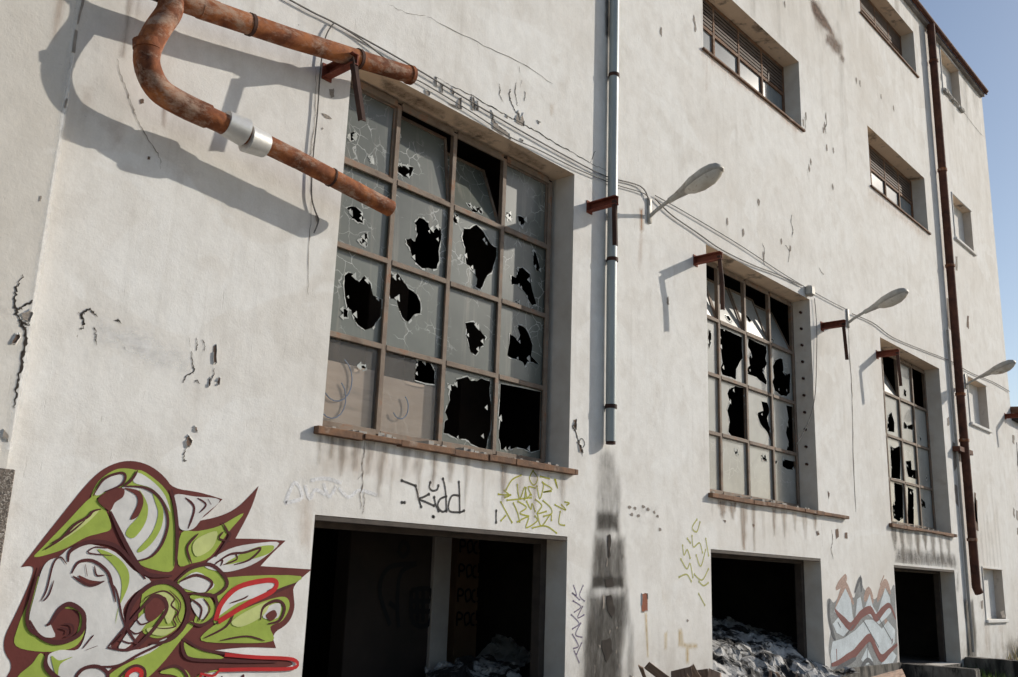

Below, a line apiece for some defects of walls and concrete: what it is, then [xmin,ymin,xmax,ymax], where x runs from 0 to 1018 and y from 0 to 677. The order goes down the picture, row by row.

crack [13,274,32,408]
water stain [598,515,617,528]
water stain [720,501,754,549]
water stain [585,540,625,677]